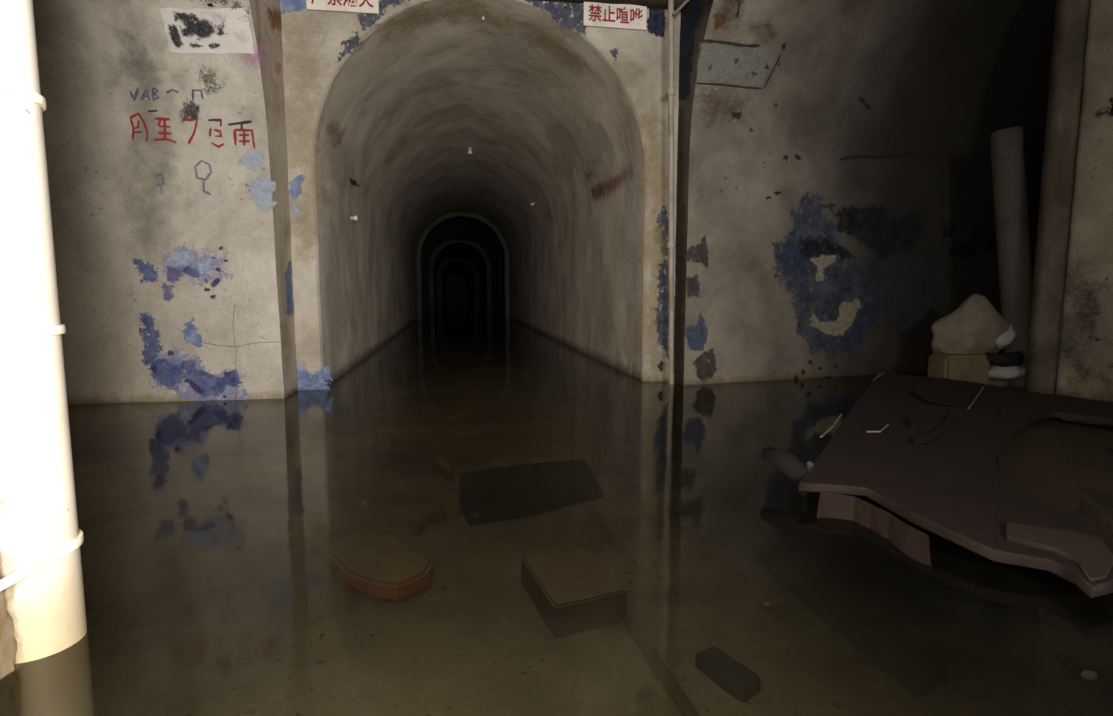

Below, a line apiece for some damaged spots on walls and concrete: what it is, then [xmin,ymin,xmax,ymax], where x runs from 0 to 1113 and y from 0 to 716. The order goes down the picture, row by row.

peeling [265,0,307,25]
peeling [338,0,405,61]
peeling [525,0,586,36]
peeling [647,8,666,37]
peeling [237,150,307,214]
peeling [132,244,232,301]
peeling [655,206,669,371]
peeling [685,236,709,298]
peeling [771,192,944,381]
peeling [138,312,250,404]
peeling [297,361,335,393]
peeling [685,313,717,381]